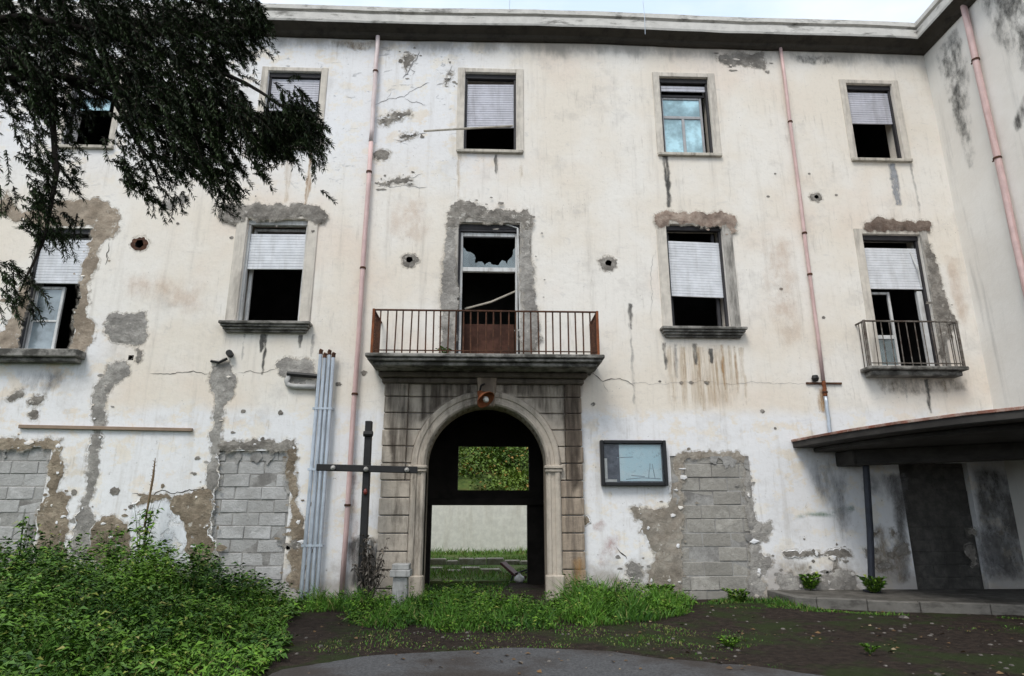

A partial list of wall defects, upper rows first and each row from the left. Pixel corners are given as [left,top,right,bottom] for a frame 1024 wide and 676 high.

spalling [714,51,773,73]
water stain [943,42,969,140]
spalling [440,197,545,351]
spalling [653,210,738,235]
water stain [890,164,901,205]
spalling [863,215,958,359]
spalling [0,191,328,590]
rust [693,344,736,385]
spalling [615,447,858,599]
water stain [874,474,907,579]
water stain [976,470,1024,578]